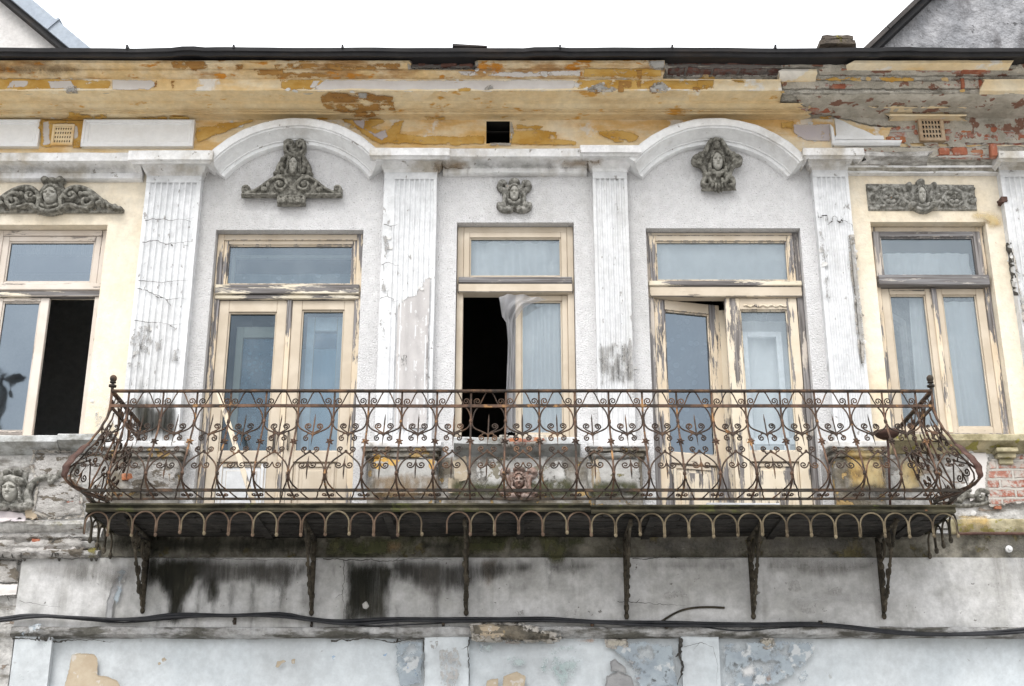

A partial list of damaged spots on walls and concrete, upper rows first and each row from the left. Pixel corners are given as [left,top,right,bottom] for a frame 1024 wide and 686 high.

peeling [38,112,107,148]
peeling [0,78,155,94]
peeling [141,116,253,142]
flaking render [280,60,1024,161]
peeling [380,276,432,428]
flaking render [0,450,86,522]
flaking render [960,451,1024,525]
damp [107,537,306,621]
damp [327,538,583,619]
peeling [65,653,120,686]
flaking render [469,622,577,686]
peeling [605,639,678,686]